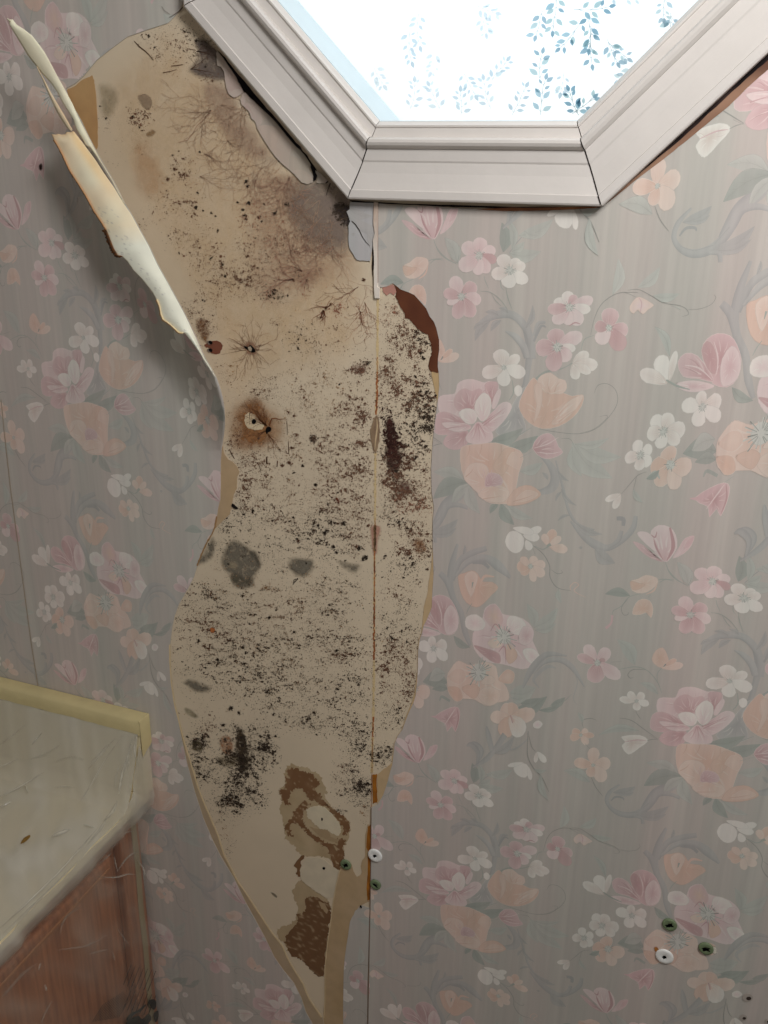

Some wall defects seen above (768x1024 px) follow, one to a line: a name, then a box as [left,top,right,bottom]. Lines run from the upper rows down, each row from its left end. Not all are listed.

leakage [126,17,437,853]
peeling [277,763,351,977]